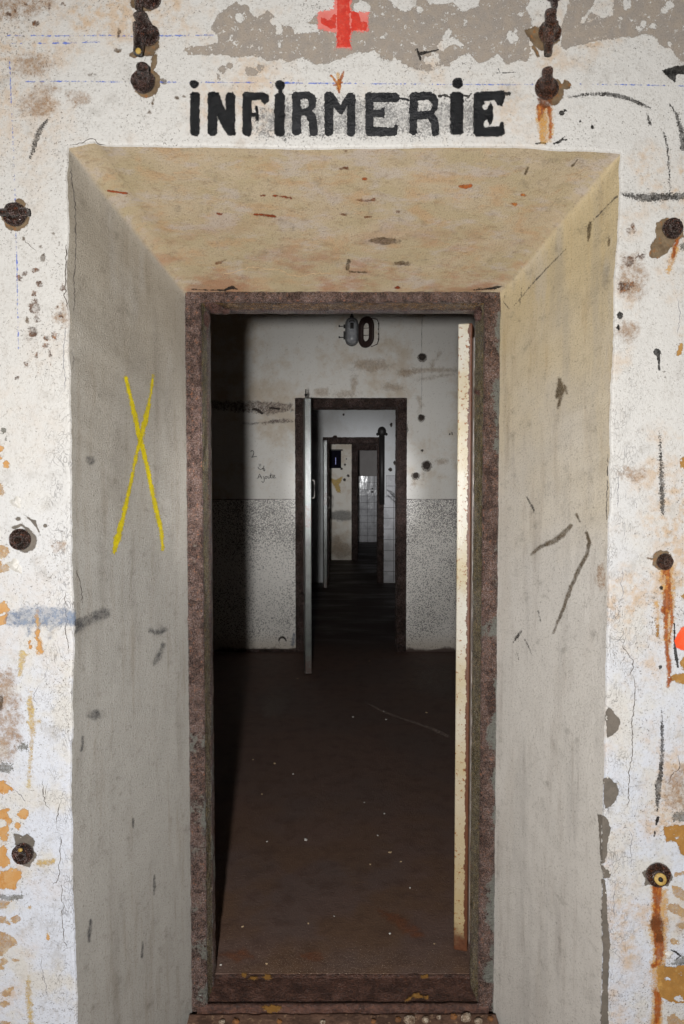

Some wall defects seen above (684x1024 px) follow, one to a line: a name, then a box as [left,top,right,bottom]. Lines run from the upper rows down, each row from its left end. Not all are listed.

peeling [184,0,684,80]
corrosion [536,98,554,143]
corrosion [655,568,675,687]
peeling [0,780,13,794]
peeling [0,808,37,970]
corrosion [649,886,668,1024]